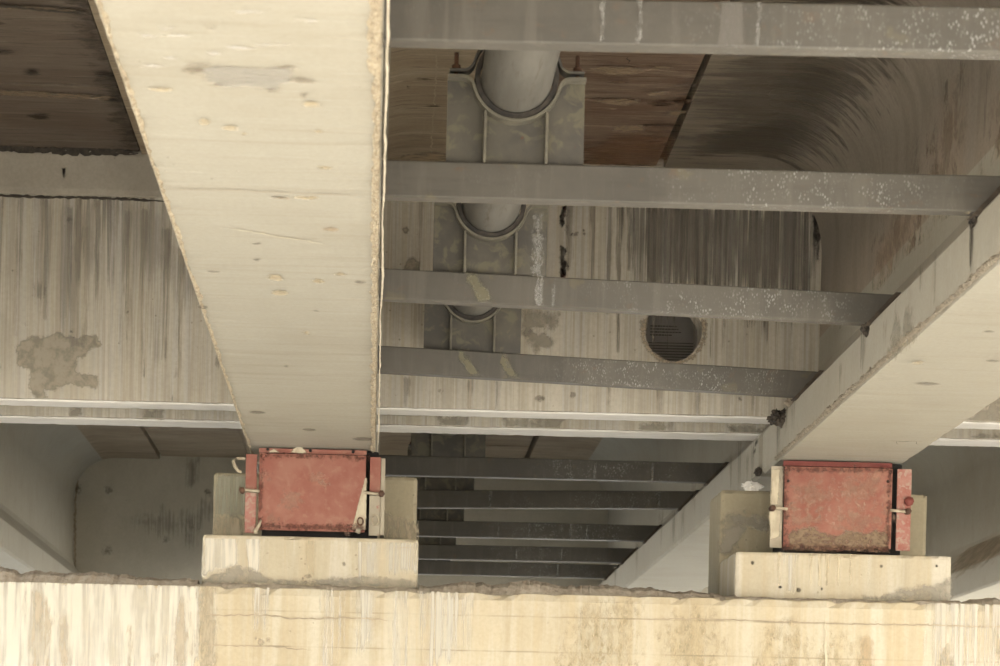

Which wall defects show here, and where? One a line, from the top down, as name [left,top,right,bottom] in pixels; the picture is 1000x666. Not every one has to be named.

crack [0,189,190,202]
spalling [96,0,254,454]
water stain [968,401,1000,421]
rust [783,467,892,552]
crack [643,615,1000,666]